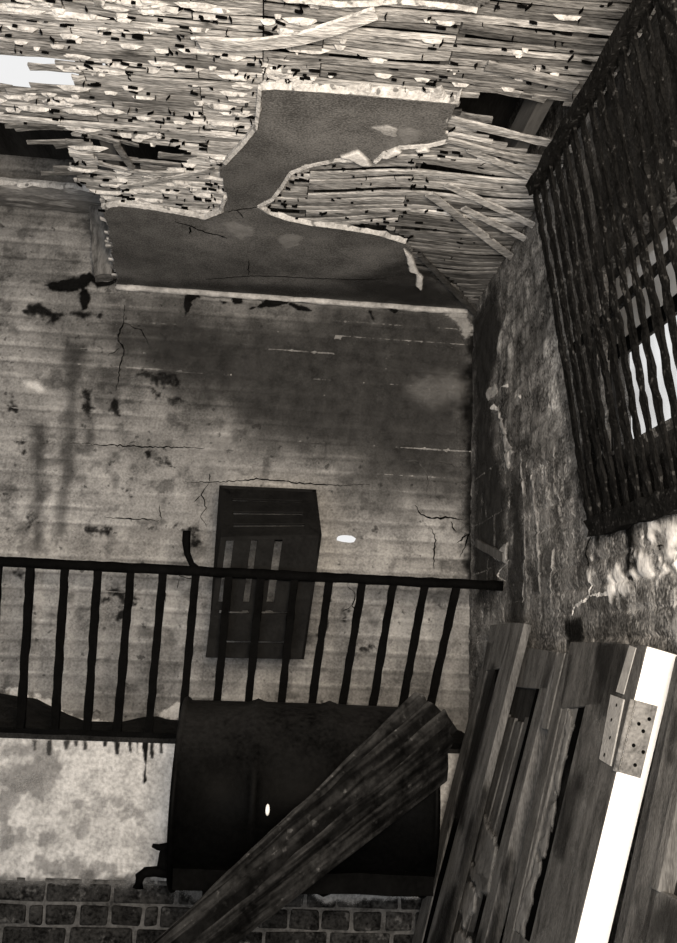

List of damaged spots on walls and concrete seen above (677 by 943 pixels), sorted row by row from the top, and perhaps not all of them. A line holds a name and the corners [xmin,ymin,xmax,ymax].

flaking render [0,0,632,470]
damp [67,345,83,389]
crack [109,305,149,388]
damp [62,436,73,483]
crack [70,441,203,449]
crack [106,505,162,521]
crack [185,474,370,524]
damp [606,521,677,602]